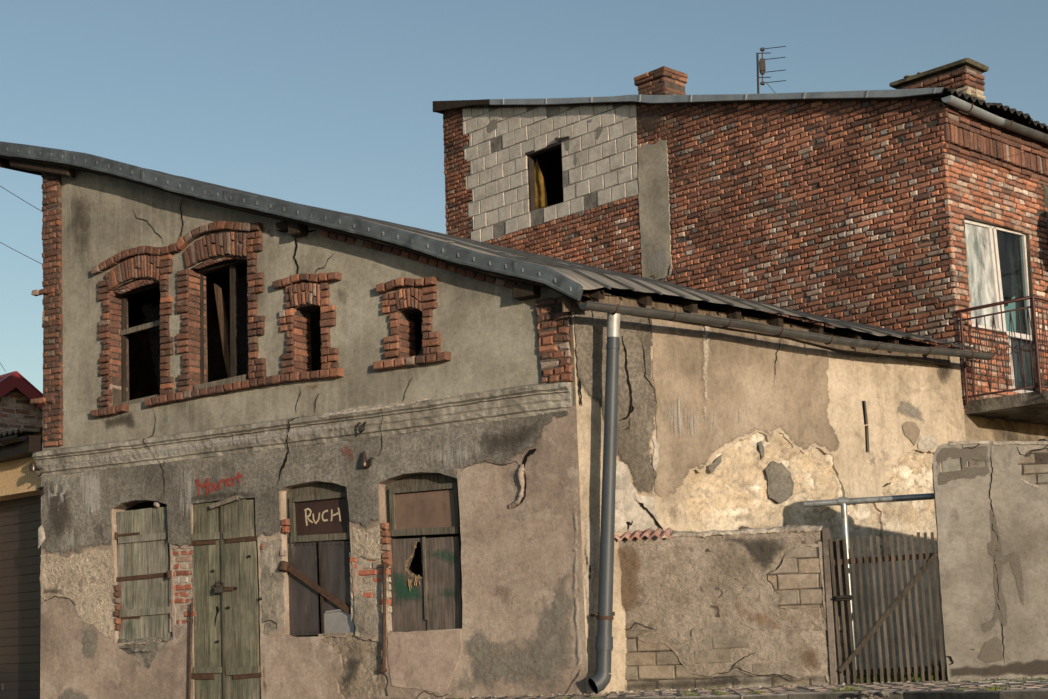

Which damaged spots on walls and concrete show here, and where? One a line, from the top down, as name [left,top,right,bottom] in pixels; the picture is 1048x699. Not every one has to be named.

crack [134,200,184,242]
spalling [38,525,196,669]
crack [276,388,319,486]
spalling [318,523,392,699]
crack [619,336,658,429]
crack [627,493,664,531]
spalling [684,421,942,557]
crack [962,441,1005,662]